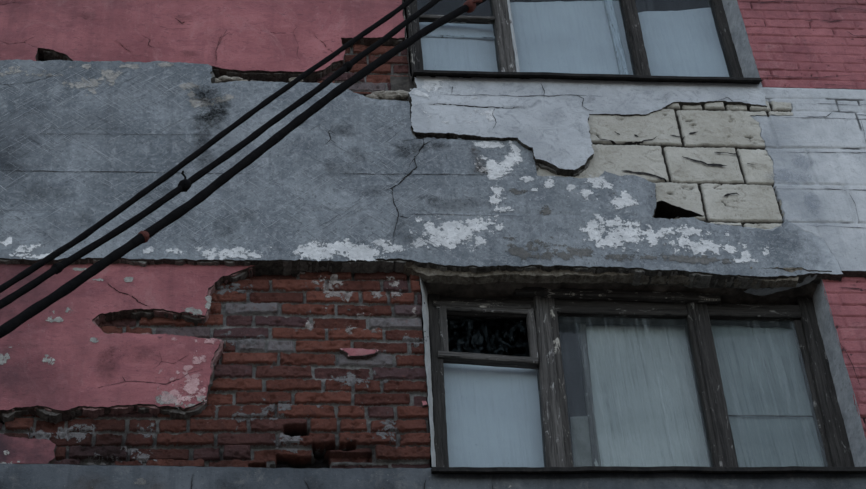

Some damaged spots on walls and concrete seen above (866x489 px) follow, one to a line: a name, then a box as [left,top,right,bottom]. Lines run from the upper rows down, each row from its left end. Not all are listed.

flaking render [210,34,450,122]
crack [387,136,475,241]
flaking render [0,101,843,468]